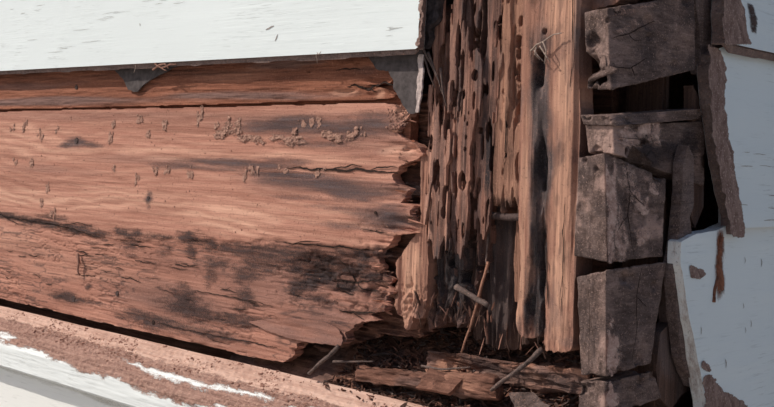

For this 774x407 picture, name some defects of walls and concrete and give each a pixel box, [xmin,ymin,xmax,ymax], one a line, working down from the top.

peeling [415,0,423,46]
peeling [708,0,758,238]
leakage [171,158,382,201]
crack [287,164,397,173]
peeling [635,183,659,215]
crack [0,214,270,310]
leakage [0,212,387,342]
peeling [690,265,706,279]
peeling [0,306,427,407]
peeling [702,361,748,407]